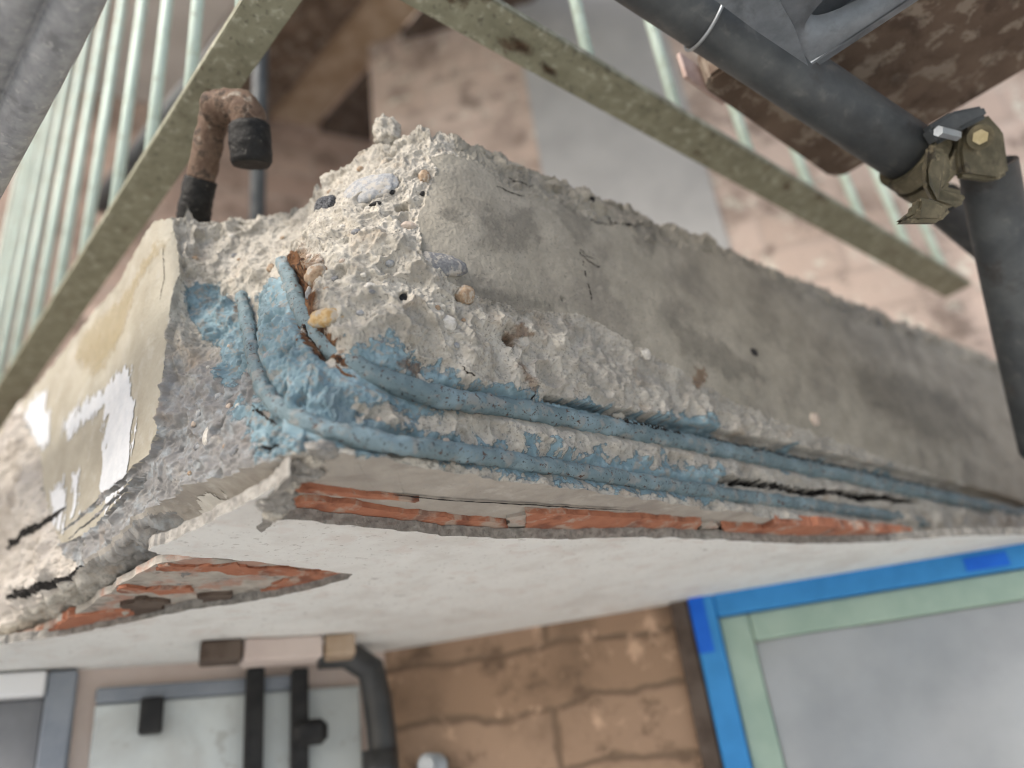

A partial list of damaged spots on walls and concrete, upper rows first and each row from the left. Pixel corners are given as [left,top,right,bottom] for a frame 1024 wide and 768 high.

corrosion [287,250,315,316]
corrosion [296,326,356,377]
flaking render [0,113,1024,673]
crack [613,417,950,504]
crack [5,506,66,550]
crack [6,565,83,600]